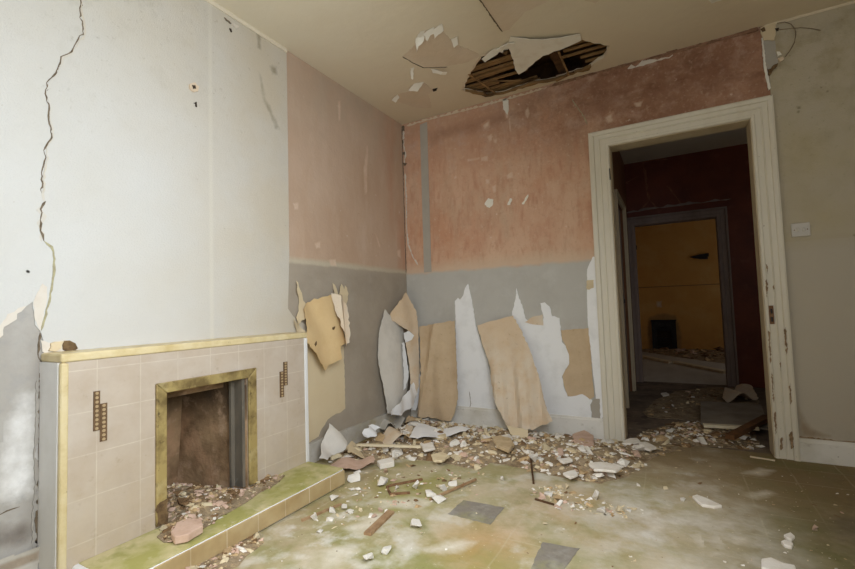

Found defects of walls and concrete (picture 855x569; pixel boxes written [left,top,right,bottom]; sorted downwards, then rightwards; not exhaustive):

peeling [392,24,591,108]
spalling [760,23,784,91]
flaking render [0,284,78,391]
crack [0,0,86,549]
peeling [586,257,603,418]
water stain [0,377,39,555]